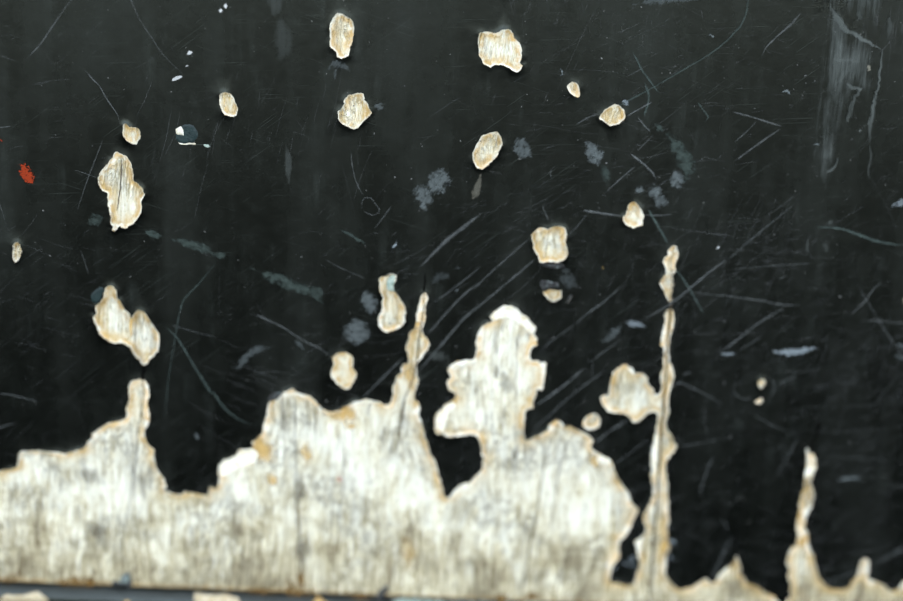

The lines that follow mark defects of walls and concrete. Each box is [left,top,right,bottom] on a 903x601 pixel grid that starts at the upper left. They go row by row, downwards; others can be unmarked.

peeling [329,13,354,59]
peeling [478,29,523,72]
peeling [123,124,141,144]
peeling [219,92,238,117]
peeling [338,93,372,129]
peeling [472,131,502,169]
peeling [599,104,625,126]
peeling [98,152,145,231]
peeling [623,202,644,228]
peeling [531,226,568,269]
peeling [0,242,903,601]